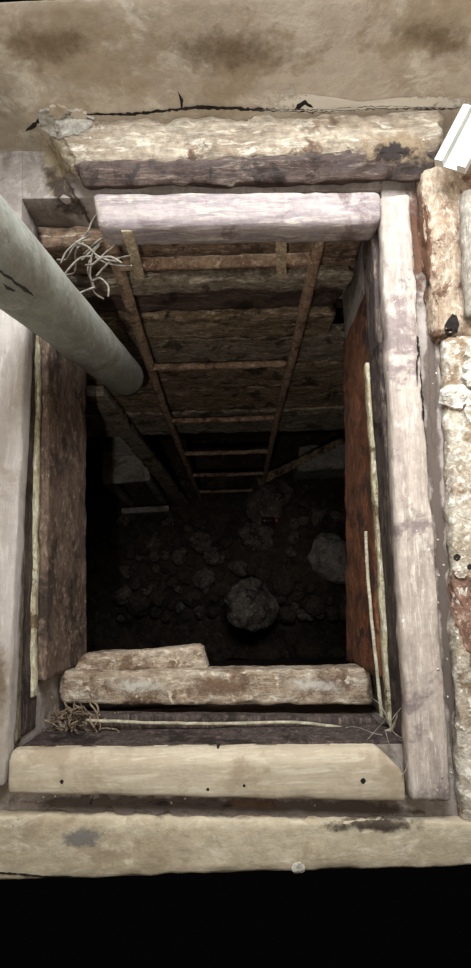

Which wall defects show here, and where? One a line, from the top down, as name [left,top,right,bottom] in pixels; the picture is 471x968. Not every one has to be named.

crack [26,92,459,131]
water stain [40,784,424,832]
water stain [66,829,100,847]
crack [0,871,75,879]